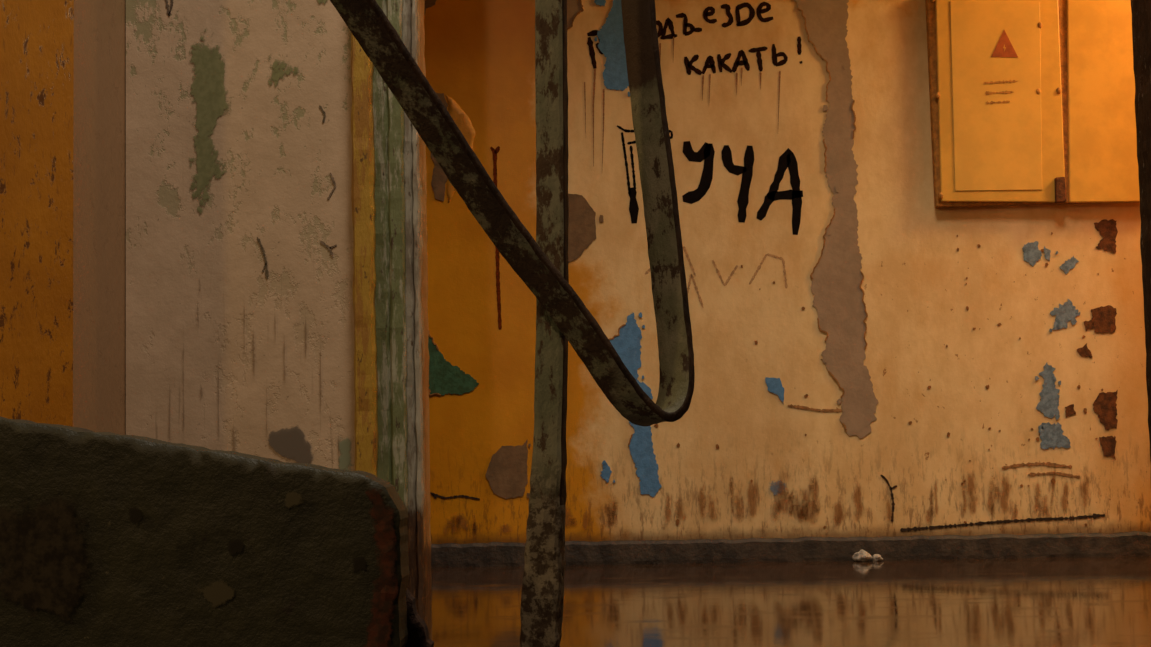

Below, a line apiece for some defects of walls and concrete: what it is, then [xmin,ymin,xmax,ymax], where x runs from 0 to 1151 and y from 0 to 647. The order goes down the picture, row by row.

peeling [567,0,630,97]
peeling [189,29,231,214]
peeling [568,194,604,262]
peeling [794,0,879,438]
peeling [1022,232,1079,274]
peeling [428,329,479,396]
peeling [609,312,653,399]
peeling [1049,299,1086,338]
peeling [1028,363,1071,450]
peeling [268,426,313,464]
peeling [486,440,531,499]
peeling [628,421,662,497]